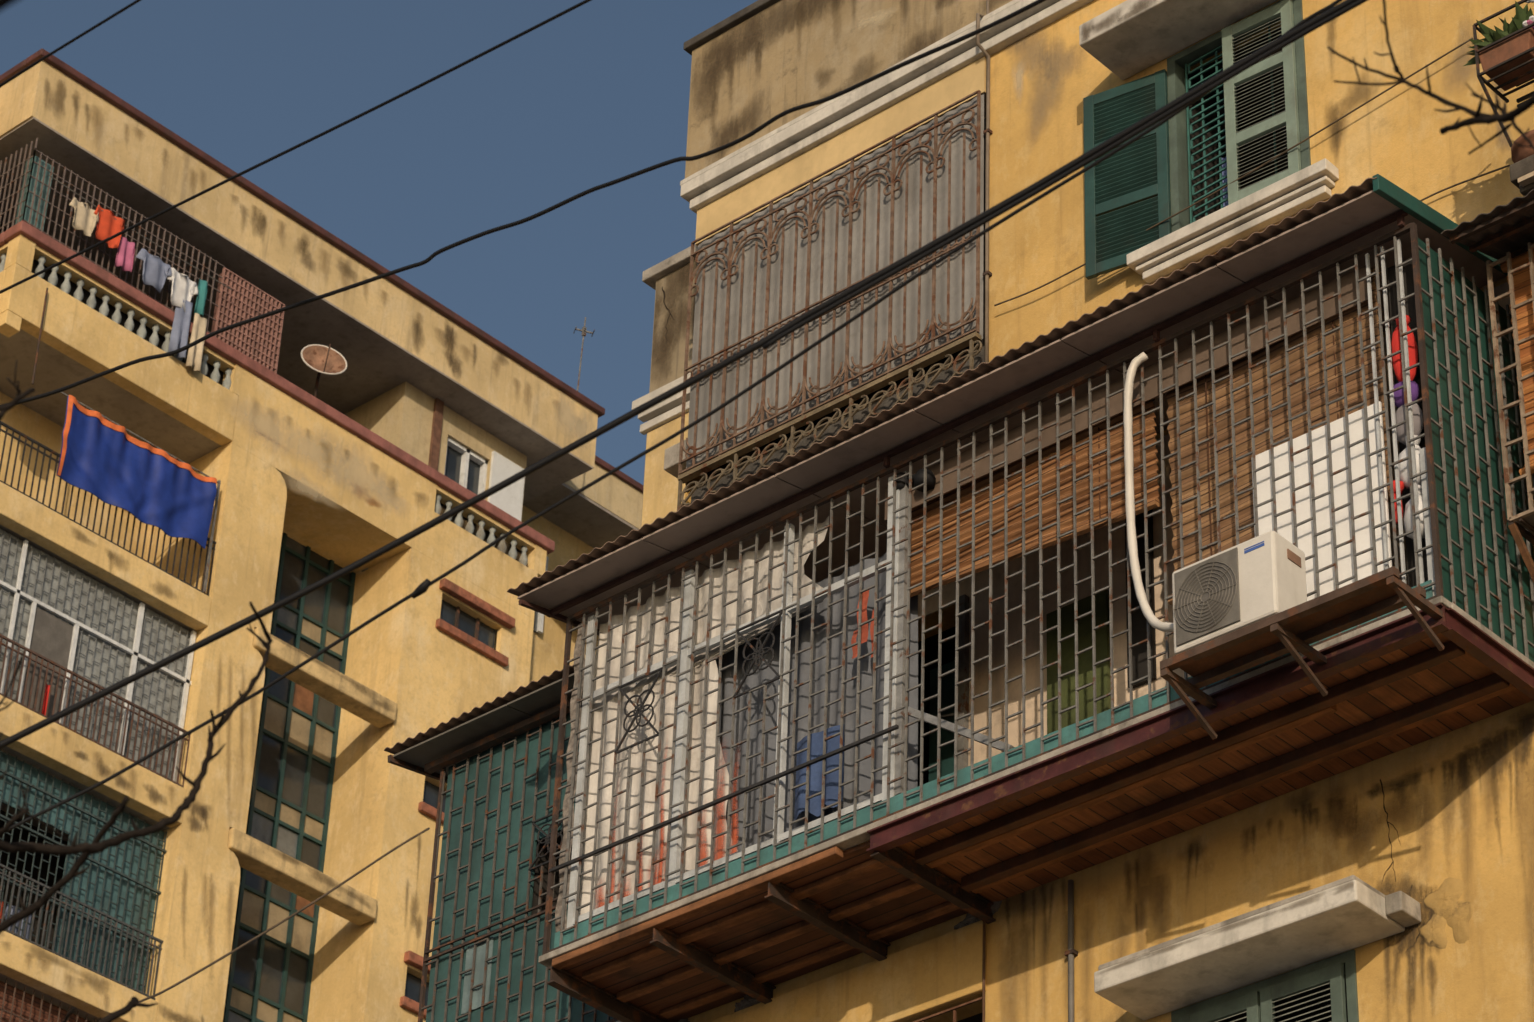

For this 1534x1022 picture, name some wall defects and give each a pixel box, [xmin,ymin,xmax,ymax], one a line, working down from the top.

leakage [445,327,459,370]
leakage [1444,715,1534,786]
leakage [192,805,207,828]
crack [1380,779,1420,950]
leakage [1381,880,1434,1000]